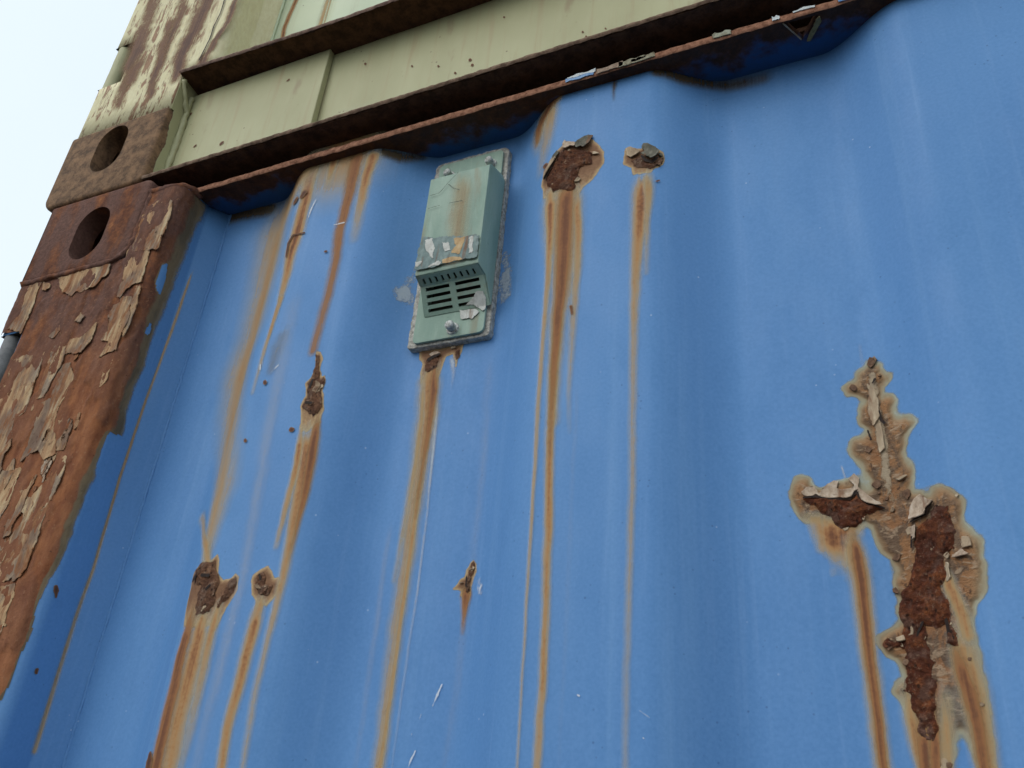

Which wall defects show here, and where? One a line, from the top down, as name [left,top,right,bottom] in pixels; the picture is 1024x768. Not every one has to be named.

corrosion [280,0,298,38]
corrosion [535,96,562,148]
corrosion [652,70,764,89]
peeling [0,199,173,634]
corrosion [0,185,206,753]
corrosion [145,132,424,768]
corrosion [374,344,464,768]
corrosion [453,560,477,625]
peeling [788,356,997,768]